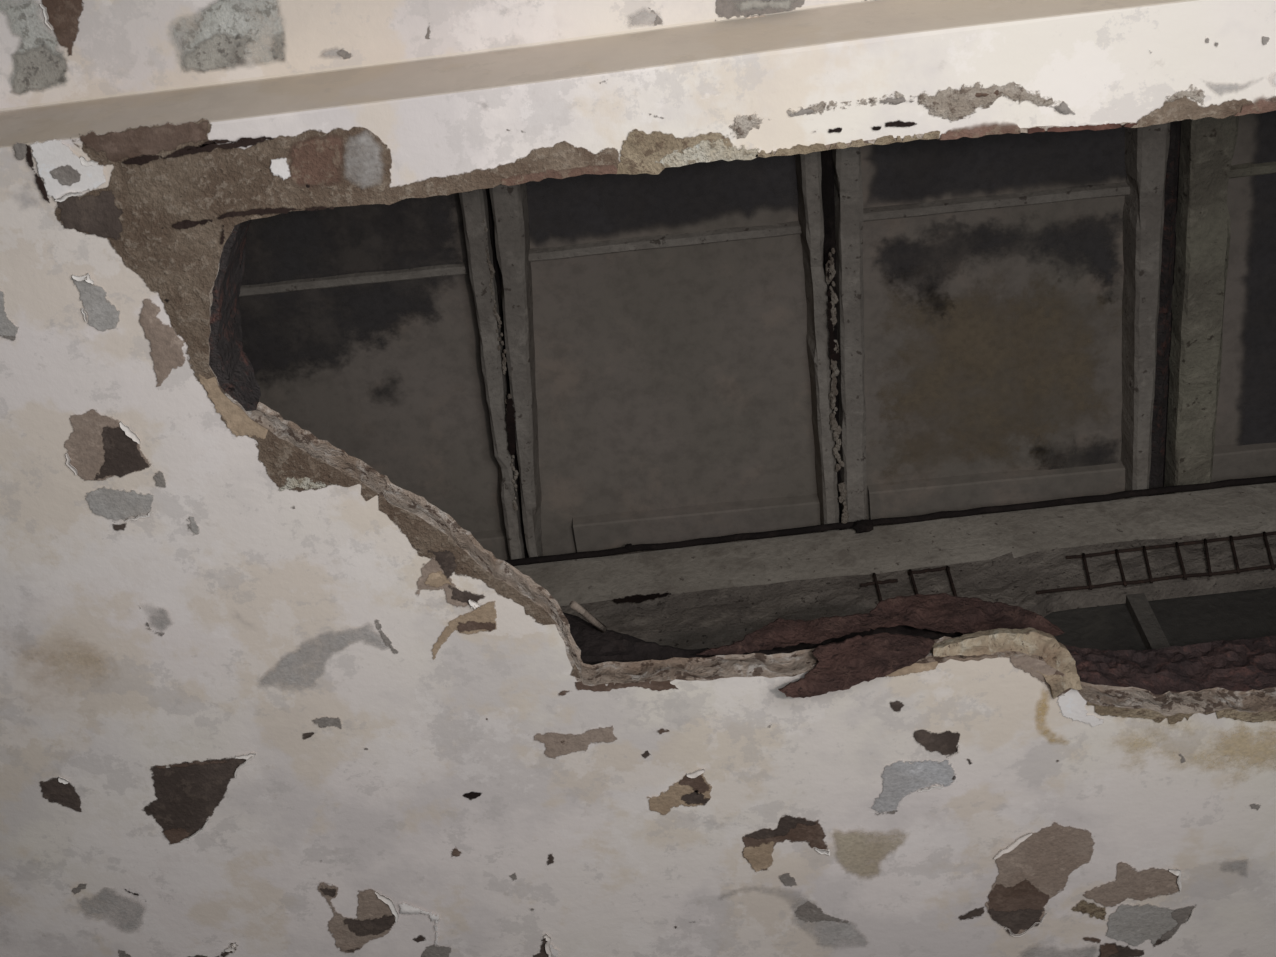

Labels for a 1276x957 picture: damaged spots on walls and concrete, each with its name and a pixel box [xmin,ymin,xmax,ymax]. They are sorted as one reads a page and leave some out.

leakage [239,194,459,382]
leakage [876,215,1119,310]
flaking render [55,113,1021,659]
flaking render [559,642,678,696]
corrosion [696,593,1065,698]
peeling [142,753,256,844]
peeling [647,769,712,815]
peeling [872,729,972,815]
peeling [318,882,451,957]
peeling [742,815,830,887]
peeling [959,822,1095,937]
peeling [1072,862,1196,957]